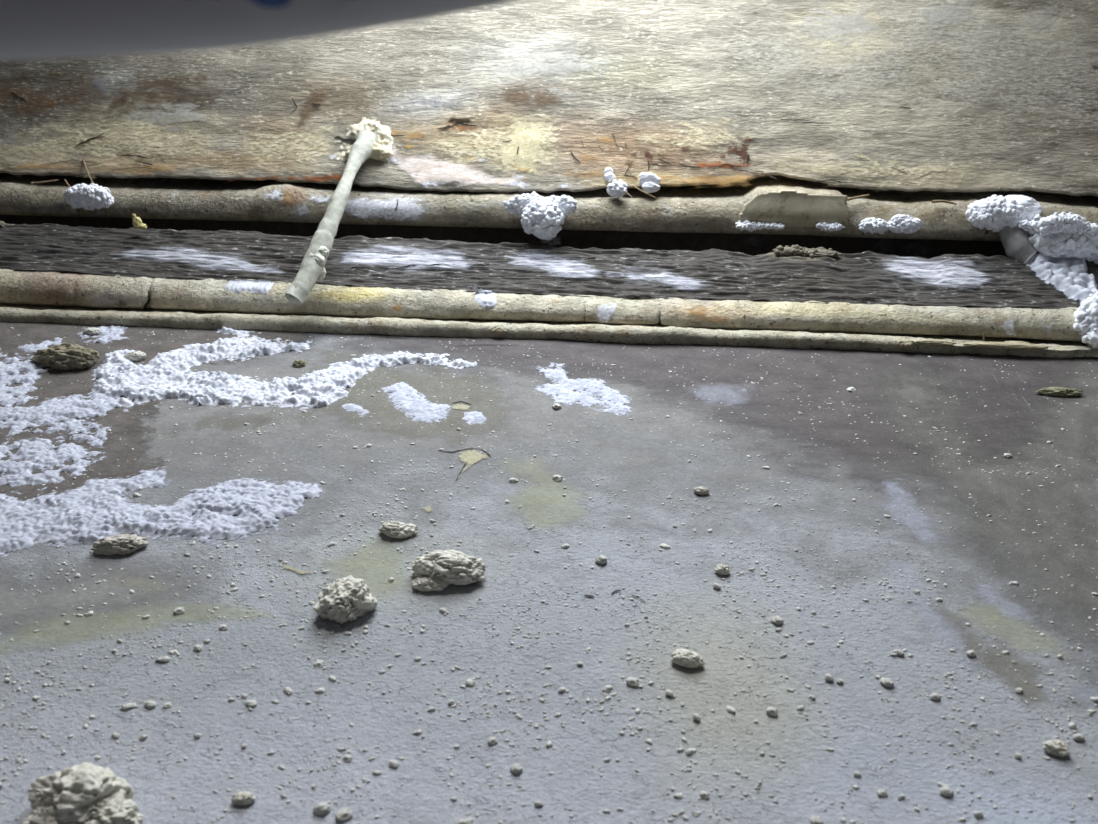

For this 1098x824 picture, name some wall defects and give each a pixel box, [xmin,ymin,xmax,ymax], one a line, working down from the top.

leakage [247,54,611,189]
corrosion [661,135,755,186]
leakage [296,196,330,216]
leakage [344,198,425,221]
leakage [0,321,1098,642]
leakage [942,610,1040,699]